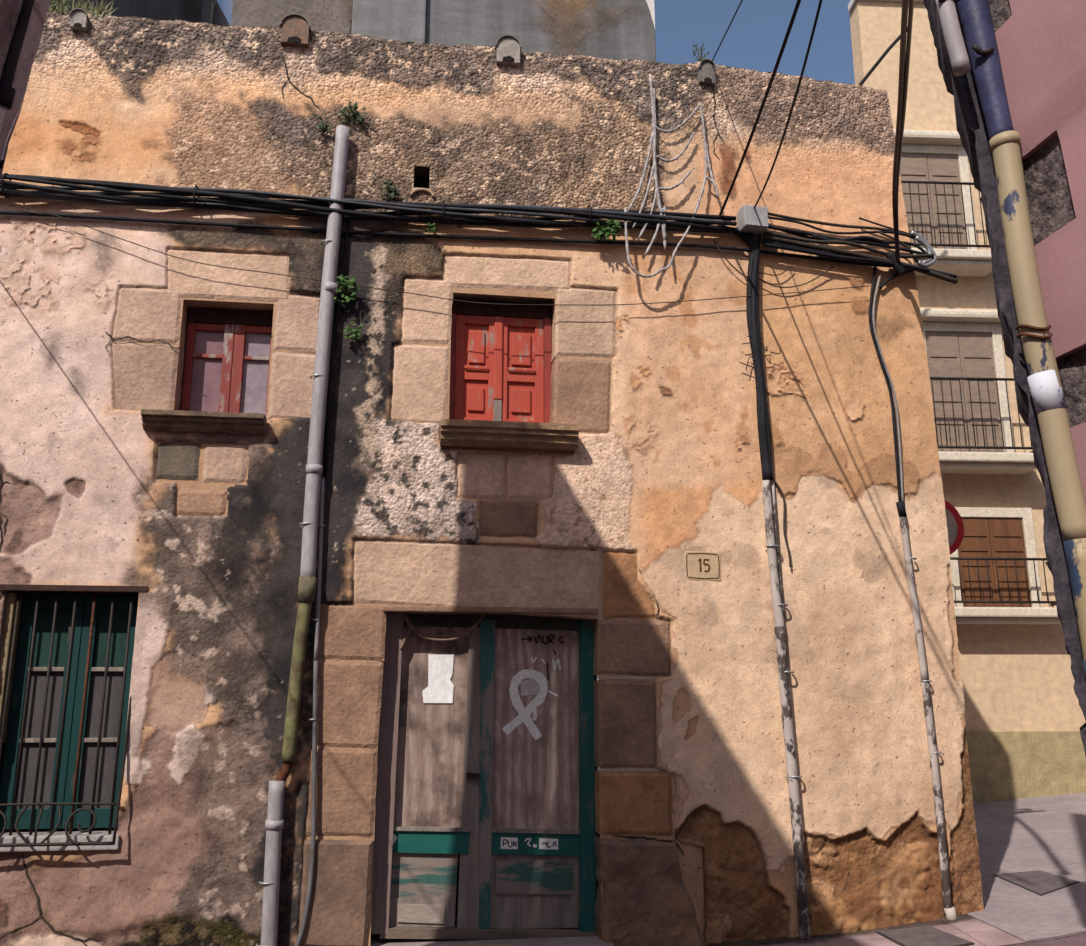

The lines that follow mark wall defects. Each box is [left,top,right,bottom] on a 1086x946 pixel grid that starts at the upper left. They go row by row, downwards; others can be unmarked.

flaking render [58,121,101,161]
crack [105,331,180,353]
flaking render [765,363,805,394]
flaking render [846,396,865,420]
crack [0,468,11,550]
flaking render [0,466,85,627]
damp [123,92,597,946]
flaking render [640,424,984,944]
flaking render [117,651,233,845]
crack [0,854,102,946]
flaking render [0,850,143,946]